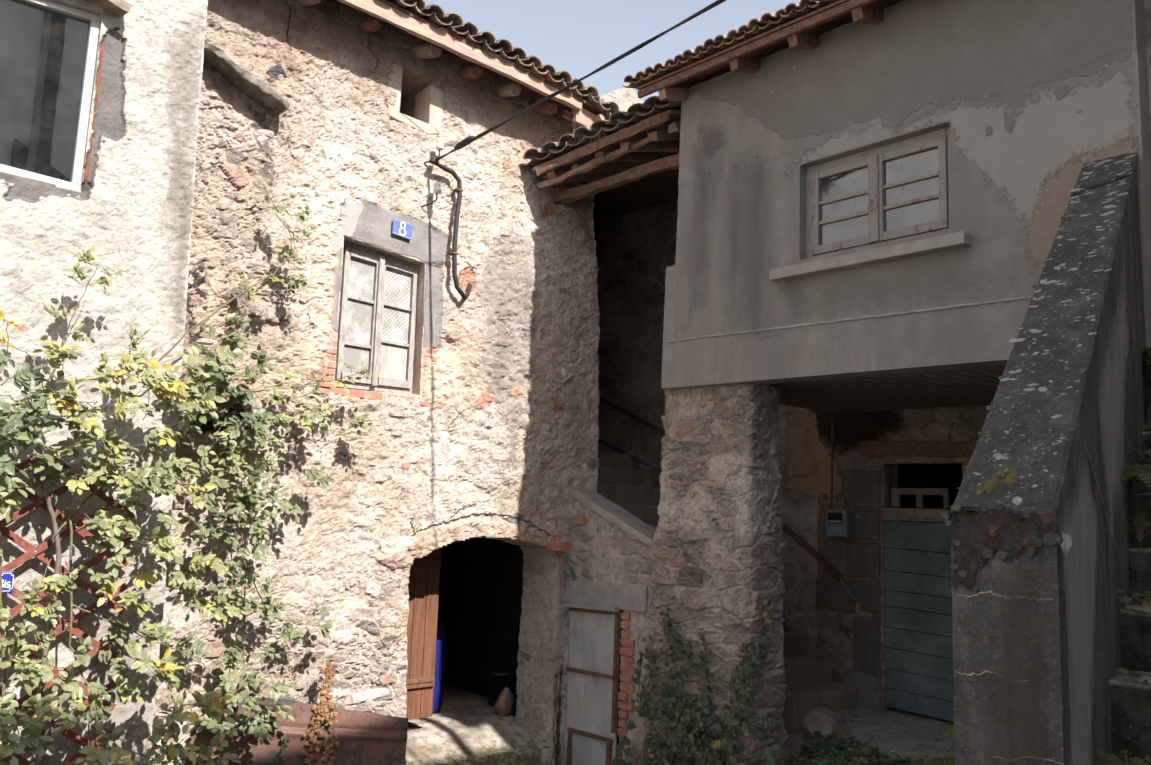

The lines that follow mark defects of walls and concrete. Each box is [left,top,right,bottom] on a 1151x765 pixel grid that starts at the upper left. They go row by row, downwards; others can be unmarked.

spalling [0,27,132,203]
peeling [689,0,1141,273]
crack [410,503,555,538]
spalling [941,506,1063,592]
crack [956,589,1051,601]
crack [958,670,1029,682]